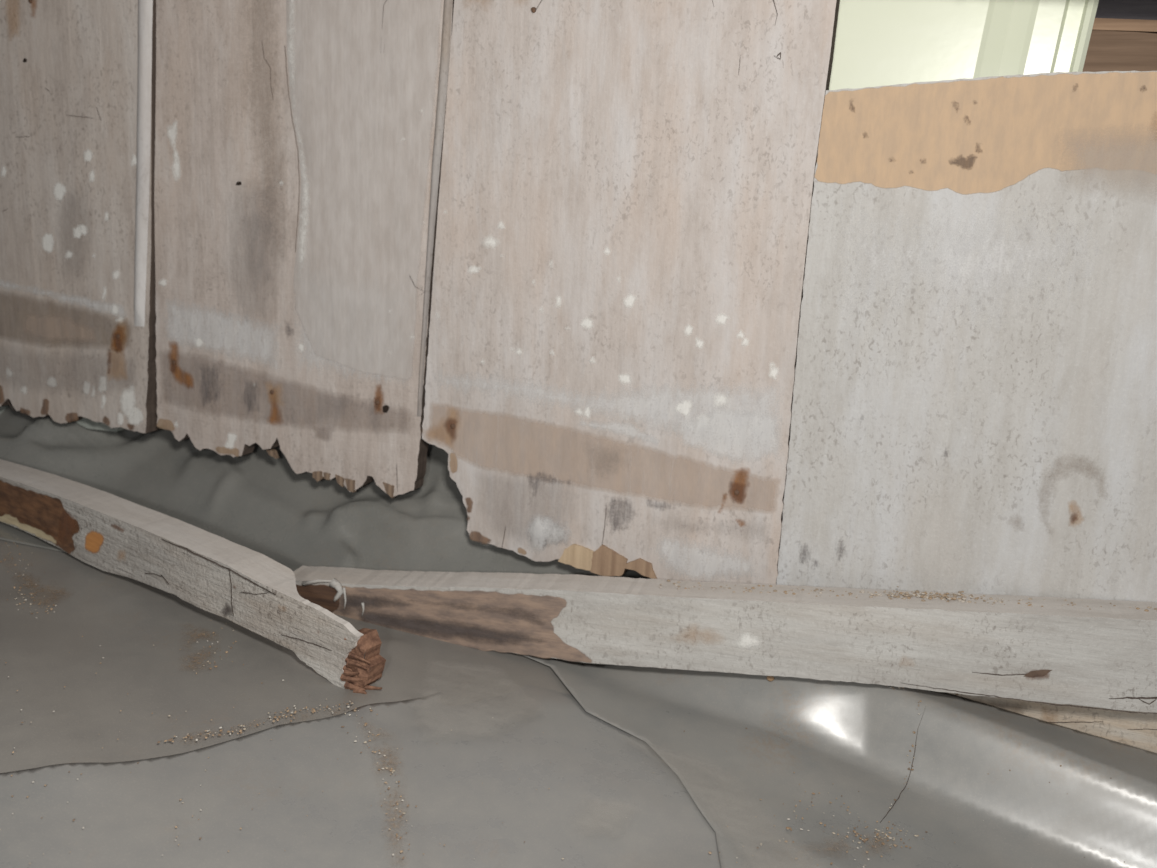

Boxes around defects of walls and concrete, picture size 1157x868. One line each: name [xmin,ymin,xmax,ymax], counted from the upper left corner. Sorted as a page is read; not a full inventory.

peeling [815,72,1157,194]
water stain [74,225,87,238]
water stain [168,305,273,361]
spalling [20,399,49,415]
water stain [118,386,143,425]
spalling [157,419,175,431]
water stain [225,434,237,449]
water stain [433,375,777,510]
spalling [312,471,356,493]
corrosion [724,471,746,501]
spalling [466,498,490,543]
spalling [558,544,657,579]